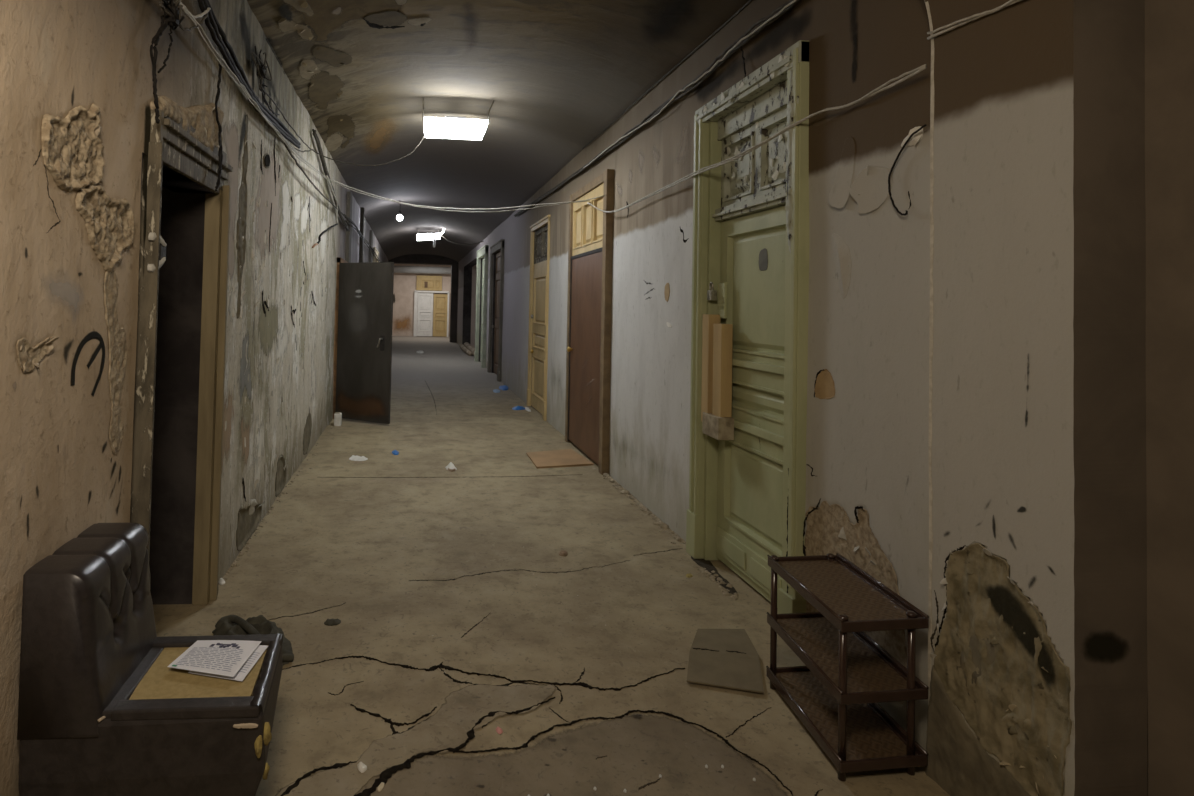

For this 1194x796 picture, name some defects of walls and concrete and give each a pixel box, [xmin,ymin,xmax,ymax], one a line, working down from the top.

peeling [278,0,356,148]
flaking render [41,103,135,273]
flaking render [13,337,59,389]
flaking render [150,96,331,551]
crack [409,548,682,581]
flaking render [803,500,900,596]
crack [280,656,823,796]
flaking render [925,543,1072,796]